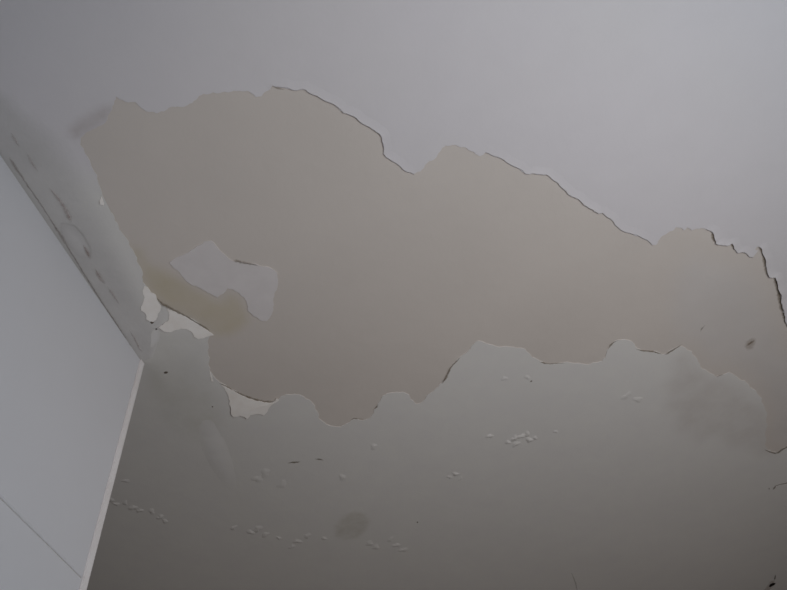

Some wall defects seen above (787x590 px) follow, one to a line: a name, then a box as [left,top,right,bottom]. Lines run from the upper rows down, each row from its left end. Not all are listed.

peeling [80,77,787,452]